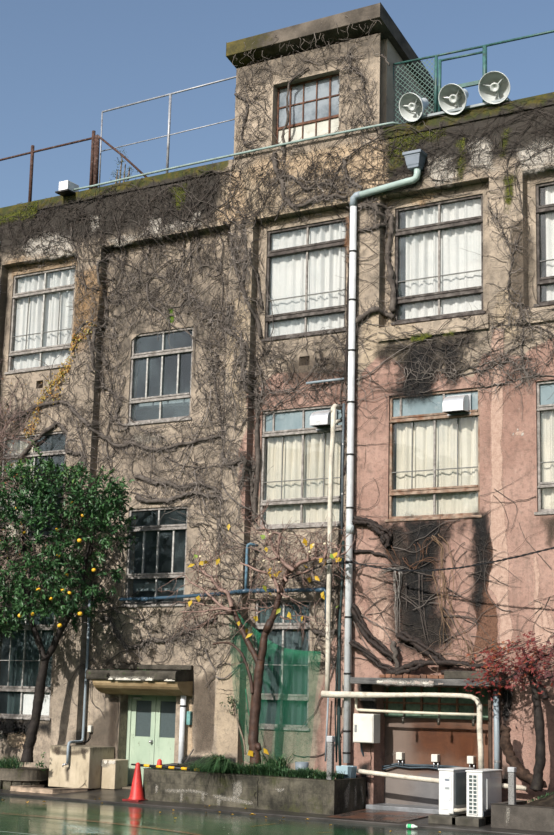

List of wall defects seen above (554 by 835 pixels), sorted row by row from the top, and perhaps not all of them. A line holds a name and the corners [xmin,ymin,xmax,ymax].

water stain [377,332,475,398]
water stain [461,329,513,653]
water stain [358,517,450,650]